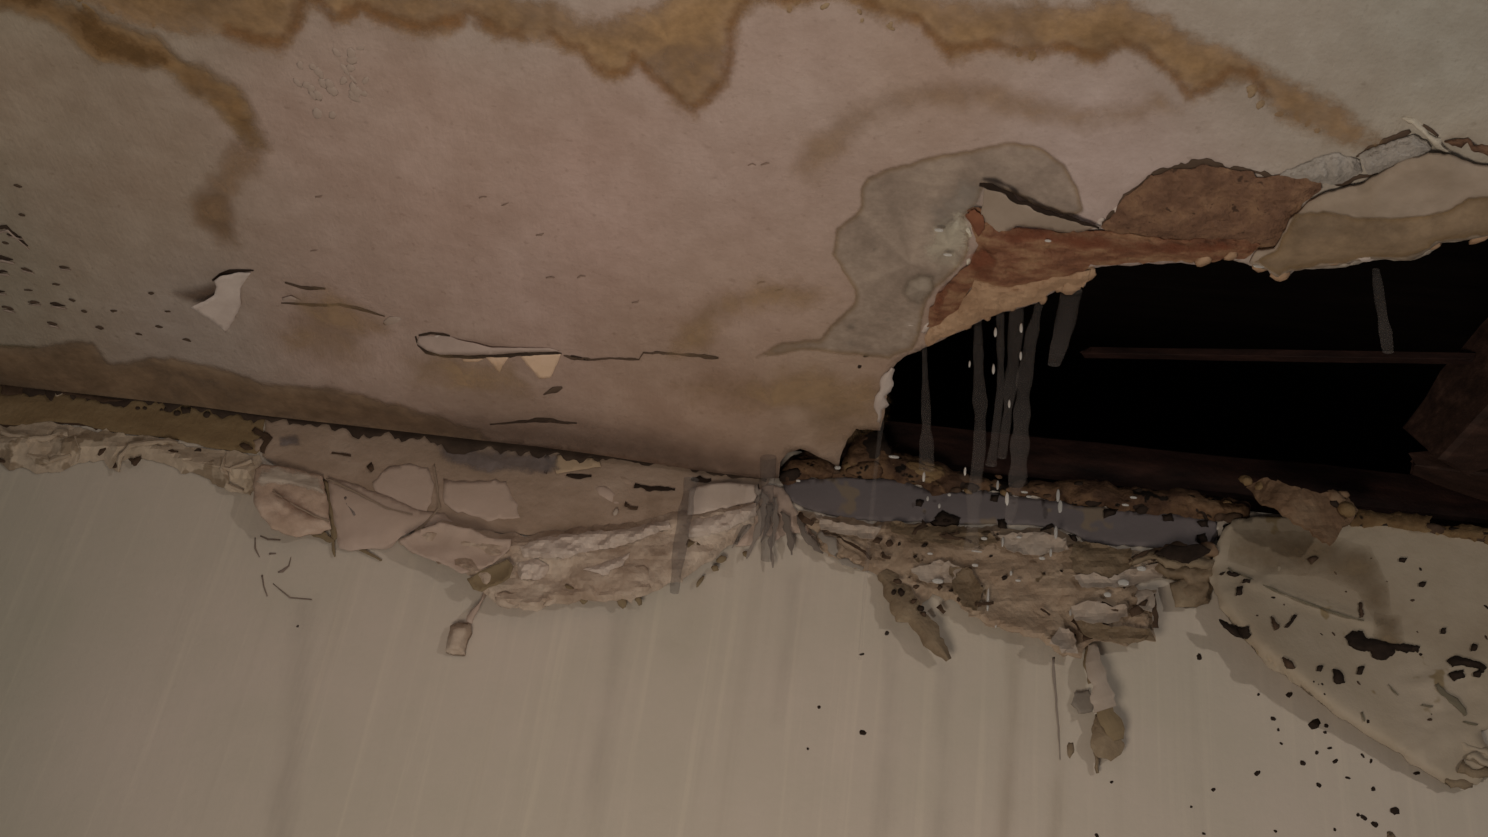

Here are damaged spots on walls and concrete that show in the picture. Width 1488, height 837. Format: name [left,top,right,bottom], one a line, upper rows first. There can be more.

water stain [0,0,812,220]
water stain [848,0,1376,145]
flaking render [954,124,1488,282]
peeling [185,269,254,333]
crack [281,282,385,317]
crack [0,332,767,542]
flaking render [0,386,1488,546]